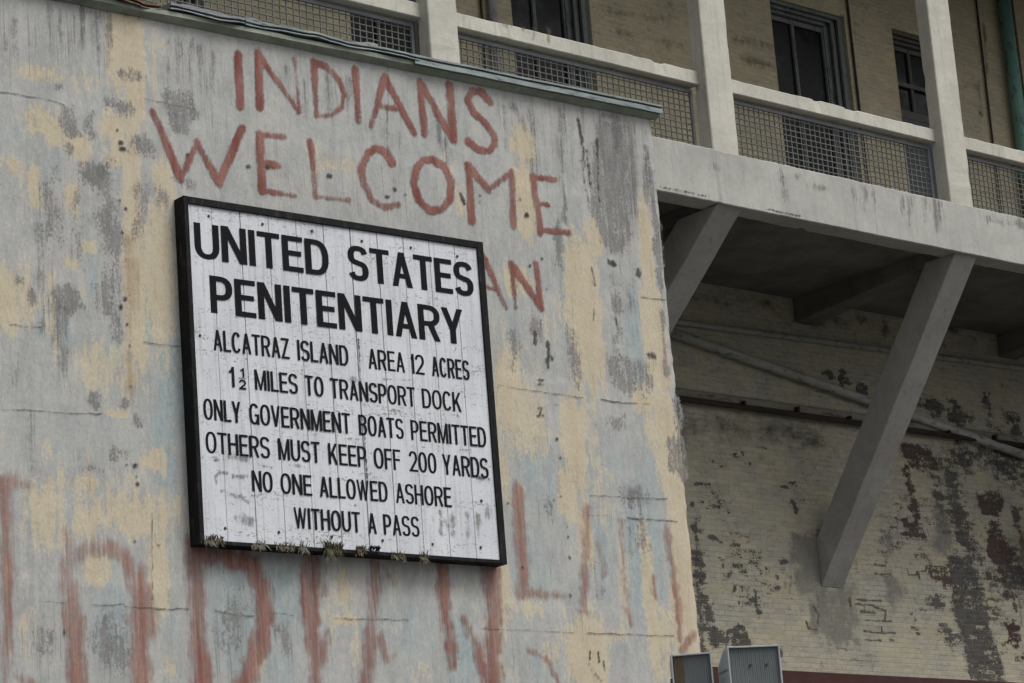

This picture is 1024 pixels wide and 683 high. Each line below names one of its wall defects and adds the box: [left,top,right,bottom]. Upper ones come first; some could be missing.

peeling [587,120,632,253]
peeling [644,146,665,293]
peeling [821,369,869,395]
peeling [916,392,1022,436]
peeling [666,394,789,653]
peeling [871,440,1024,682]